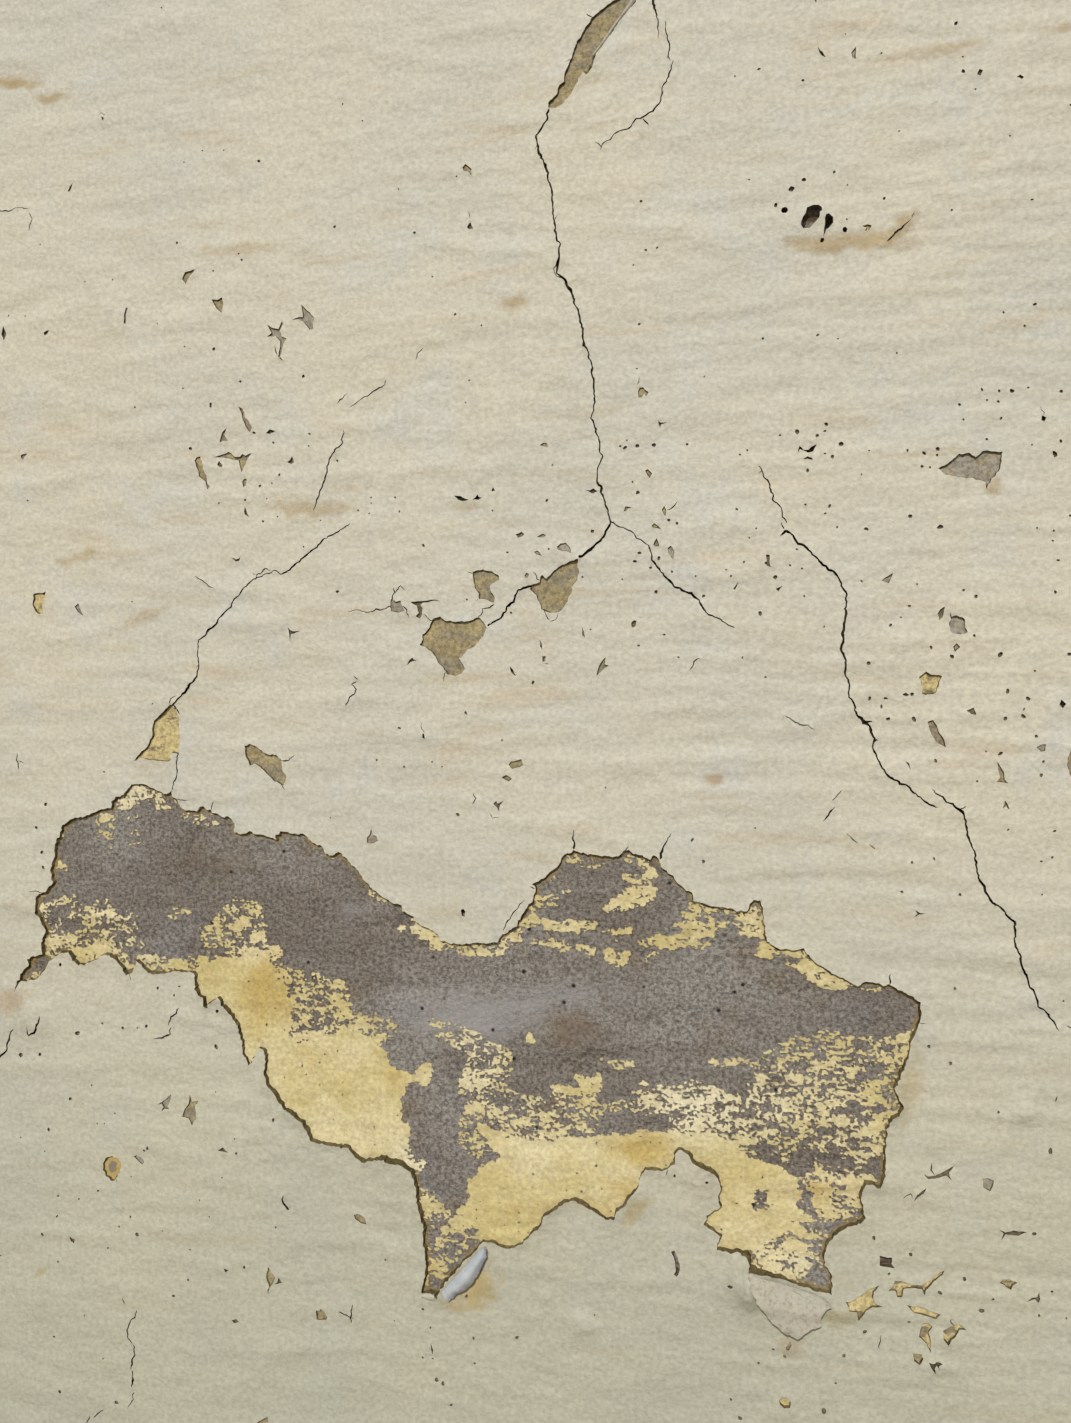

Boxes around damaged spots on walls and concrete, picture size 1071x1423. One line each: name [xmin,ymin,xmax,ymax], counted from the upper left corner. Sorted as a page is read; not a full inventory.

peeling [548,0,636,108]
crack [595,0,673,148]
crack [535,109,735,628]
peeling [939,450,1002,488]
crack [164,381,386,714]
peeling [349,569,499,680]
crack [487,585,532,626]
peeling [516,532,582,621]
peeling [135,705,180,762]
peeling [244,744,294,790]
crack [759,466,1071,1031]
peeling [15,784,966,1374]